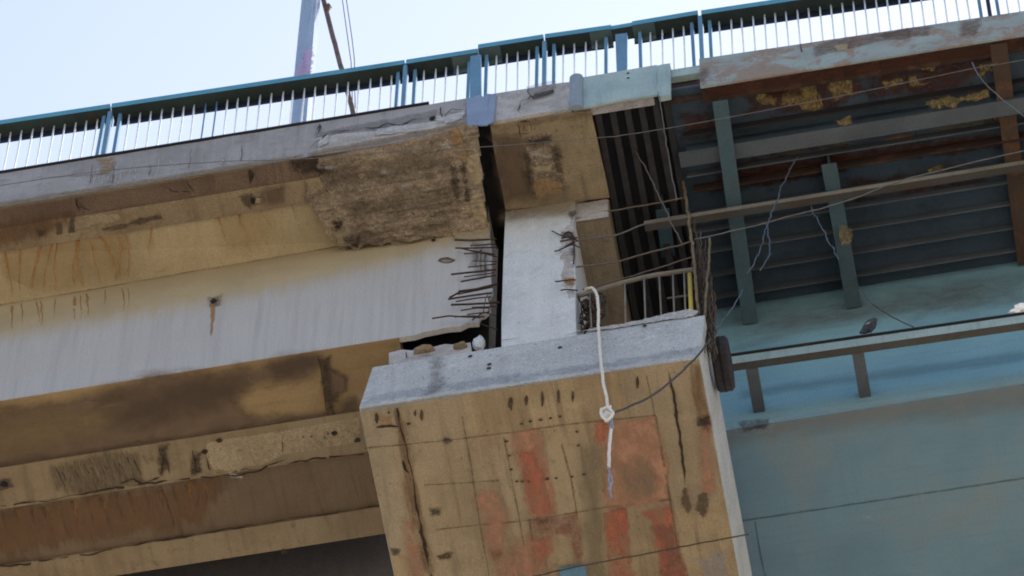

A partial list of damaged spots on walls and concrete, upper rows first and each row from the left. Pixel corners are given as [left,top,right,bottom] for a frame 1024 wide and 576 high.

rust [816,27,929,56]
peeling [756,80,853,110]
rust [699,46,993,113]
peeling [930,91,989,109]
spalling [524,133,566,197]
rust [736,121,999,186]
spalling [299,111,499,330]
spalling [552,210,580,299]
damp [0,357,356,491]
spalling [201,417,361,478]
crack [669,374,691,512]
crack [376,408,432,576]